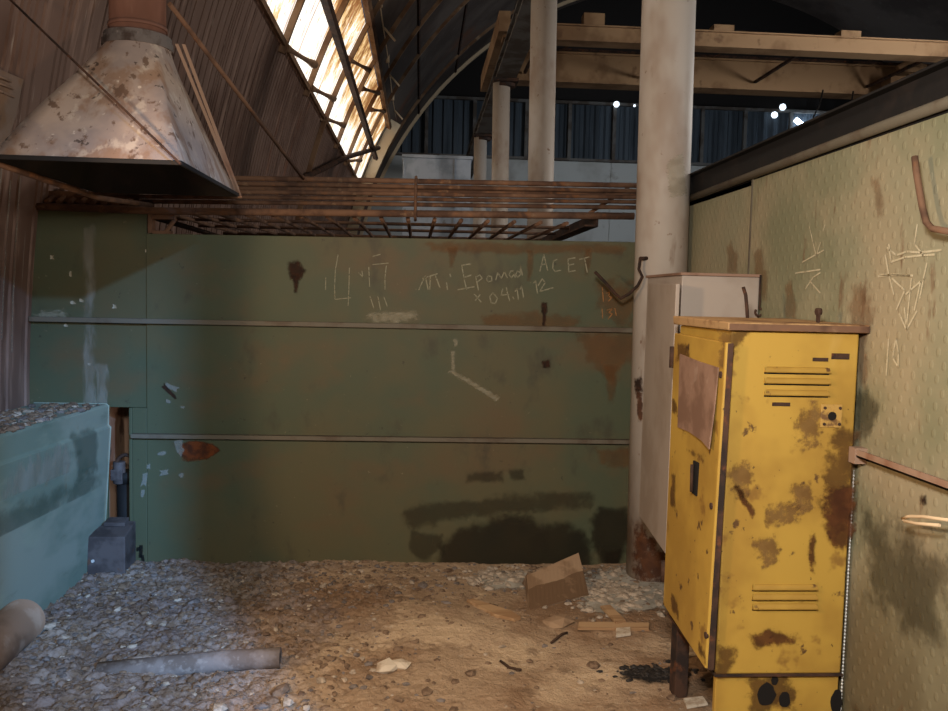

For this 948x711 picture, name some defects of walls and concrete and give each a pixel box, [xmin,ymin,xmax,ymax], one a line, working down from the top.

corrosion [289,261,305,292]
spalling [179,441,220,461]
leakage [441,508,627,590]
corrosion [632,527,665,582]